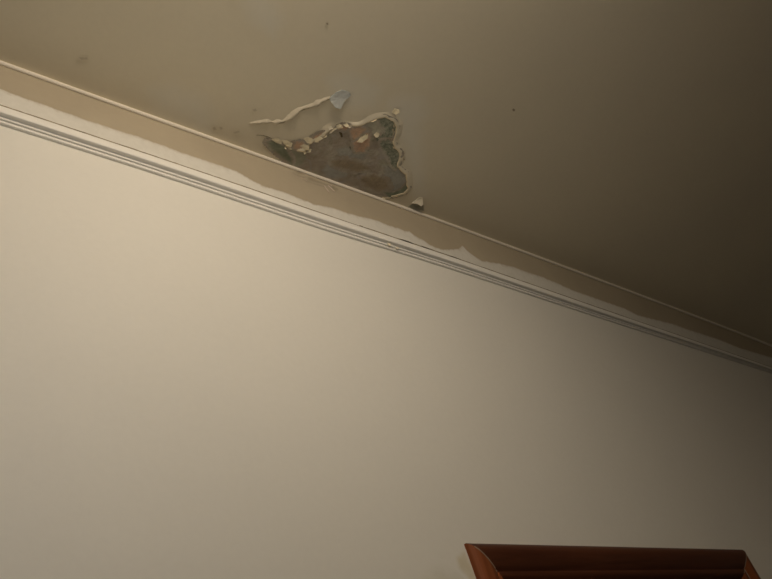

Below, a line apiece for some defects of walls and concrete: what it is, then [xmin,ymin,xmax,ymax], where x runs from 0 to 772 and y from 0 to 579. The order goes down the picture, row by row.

peeling [0,84,772,367]